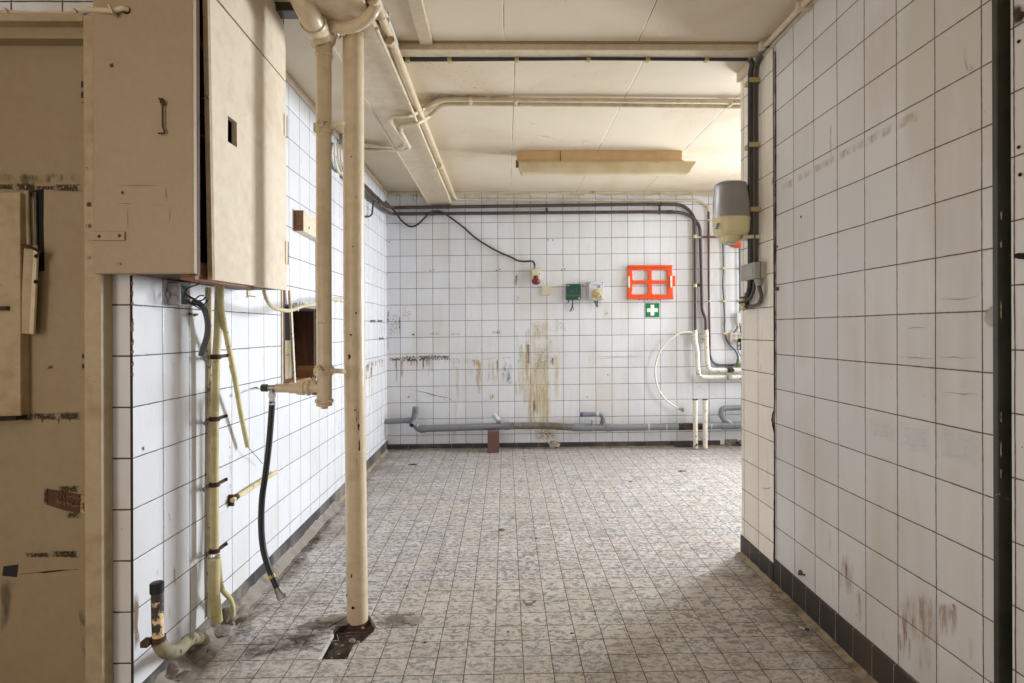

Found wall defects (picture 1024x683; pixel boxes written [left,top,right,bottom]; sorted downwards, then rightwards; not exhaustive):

peeling [0,184,78,197]
corrosion [390,355,508,378]
spalling [44,486,76,502]